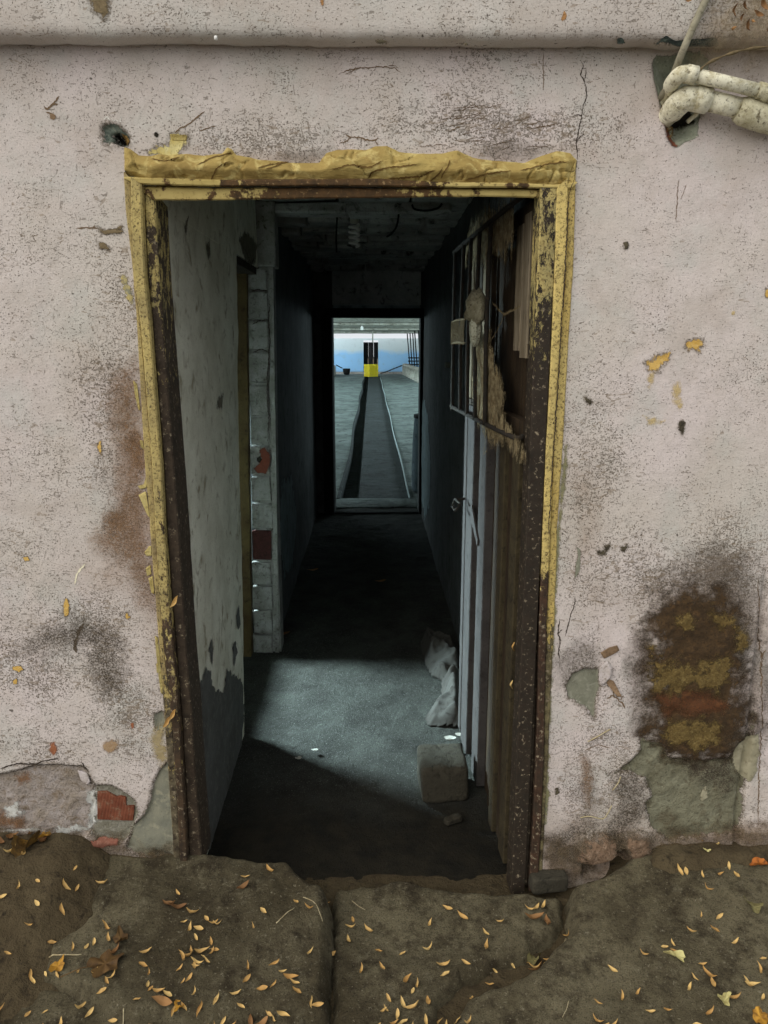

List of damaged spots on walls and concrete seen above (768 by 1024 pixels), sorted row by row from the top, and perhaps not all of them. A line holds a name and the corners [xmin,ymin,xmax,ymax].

spalling [101,121,132,148]
crack [425,63,587,549]
peeling [138,478,150,518]
spalling [254,447,270,474]
damp [631,553,768,767]
spalling [85,710,174,857]
spalling [611,710,760,844]